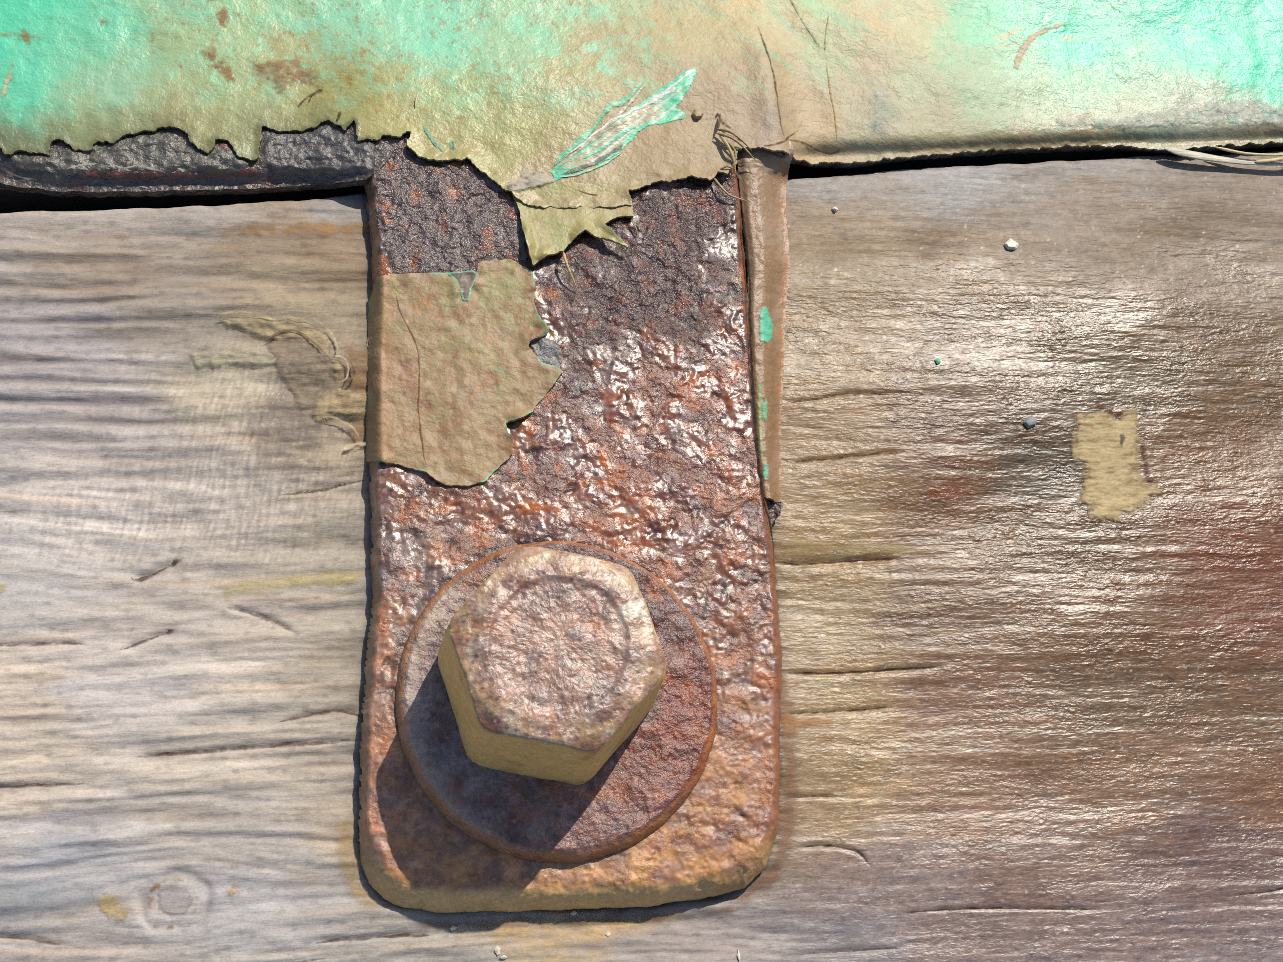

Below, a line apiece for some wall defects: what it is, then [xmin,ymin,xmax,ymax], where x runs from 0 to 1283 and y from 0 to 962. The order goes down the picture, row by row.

corrosion [256,59,316,93]
corrosion [3,126,375,181]
corrosion [346,349,368,393]
peeling [191,134,794,560]
peeling [1072,404,1160,520]